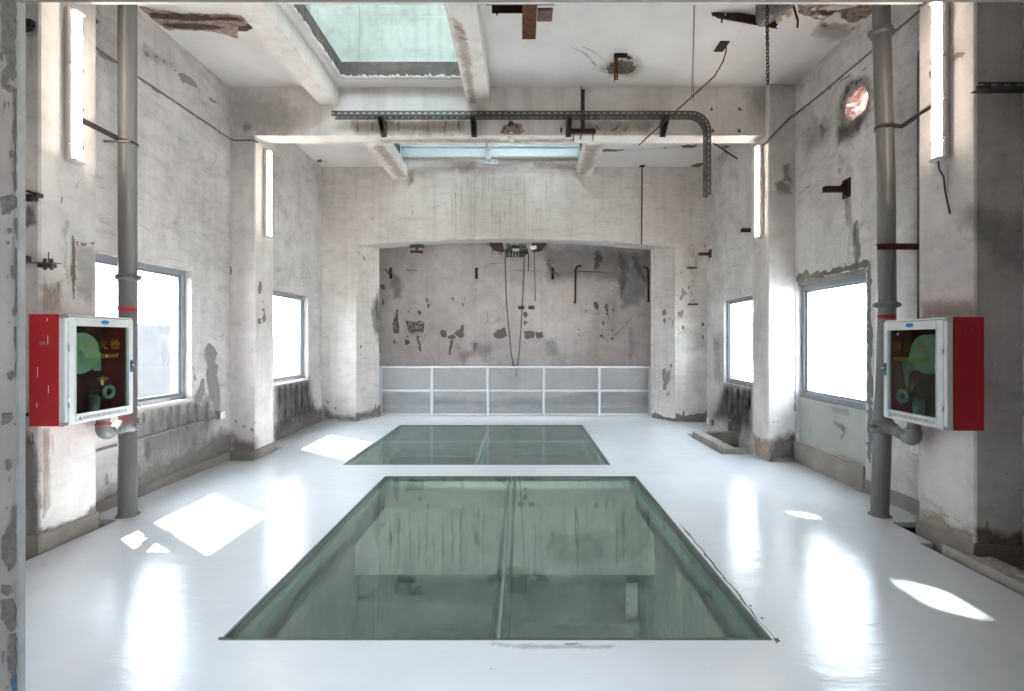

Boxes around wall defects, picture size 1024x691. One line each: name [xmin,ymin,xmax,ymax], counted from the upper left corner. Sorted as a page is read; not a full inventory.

spalling [140,6,253,39]
spalling [798,4,872,30]
spalling [606,55,636,74]
water stain [838,78,870,144]
peeling [392,298,430,351]
peeling [440,325,464,355]
peeling [493,328,507,339]
peeling [523,312,544,343]
water stain [274,379,794,461]
peeling [1,505,17,572]
peeling [1,584,17,689]